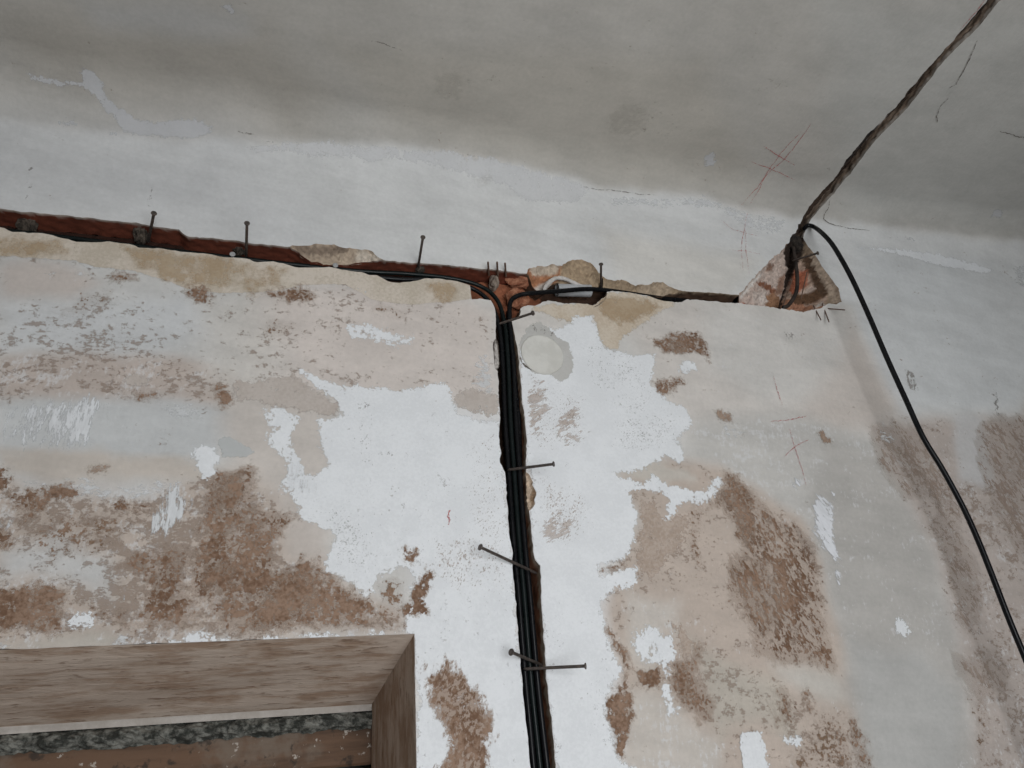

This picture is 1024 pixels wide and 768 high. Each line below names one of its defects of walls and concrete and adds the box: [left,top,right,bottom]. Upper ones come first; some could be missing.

peeling [267,287,315,303]
spalling [290,244,381,266]
spalling [527,259,682,296]
spalling [738,237,842,312]
peeling [654,332,708,356]
peeling [0,580,66,636]
peeling [0,468,148,566]
peeling [91,465,434,636]
peeling [601,496,702,581]
peeling [707,473,835,673]
peeling [424,656,493,768]
peeling [605,620,712,759]